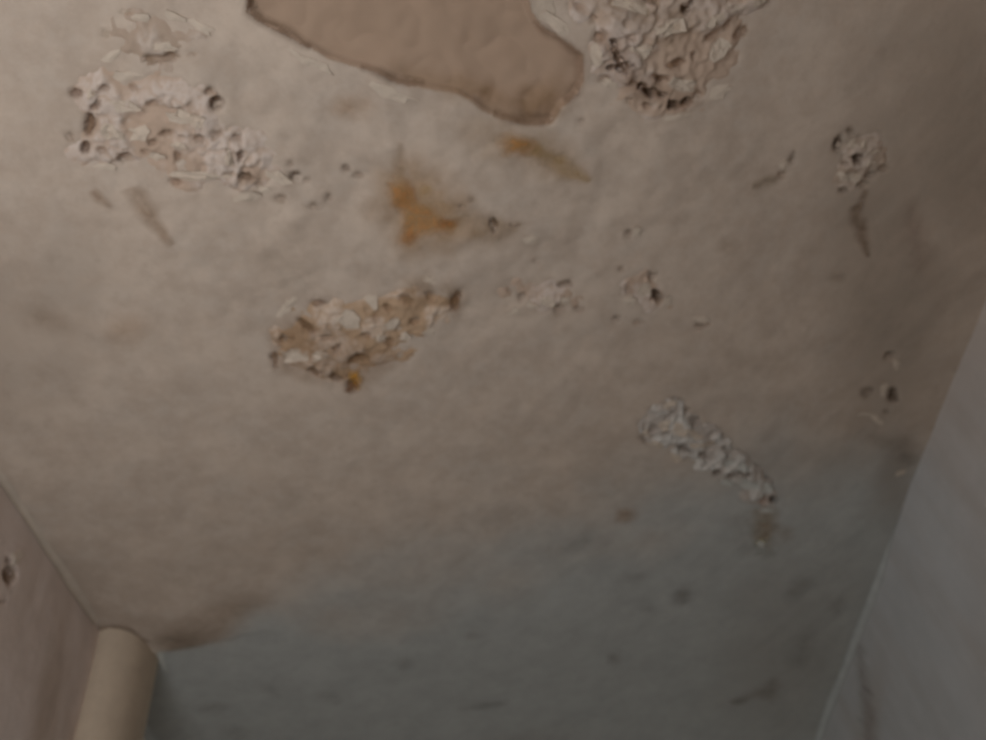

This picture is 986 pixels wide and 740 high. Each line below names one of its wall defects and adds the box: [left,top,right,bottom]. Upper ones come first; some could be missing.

peeling [64,7,299,202]
spalling [245,0,769,126]
spalling [831,132,888,191]
peeling [269,275,460,393]